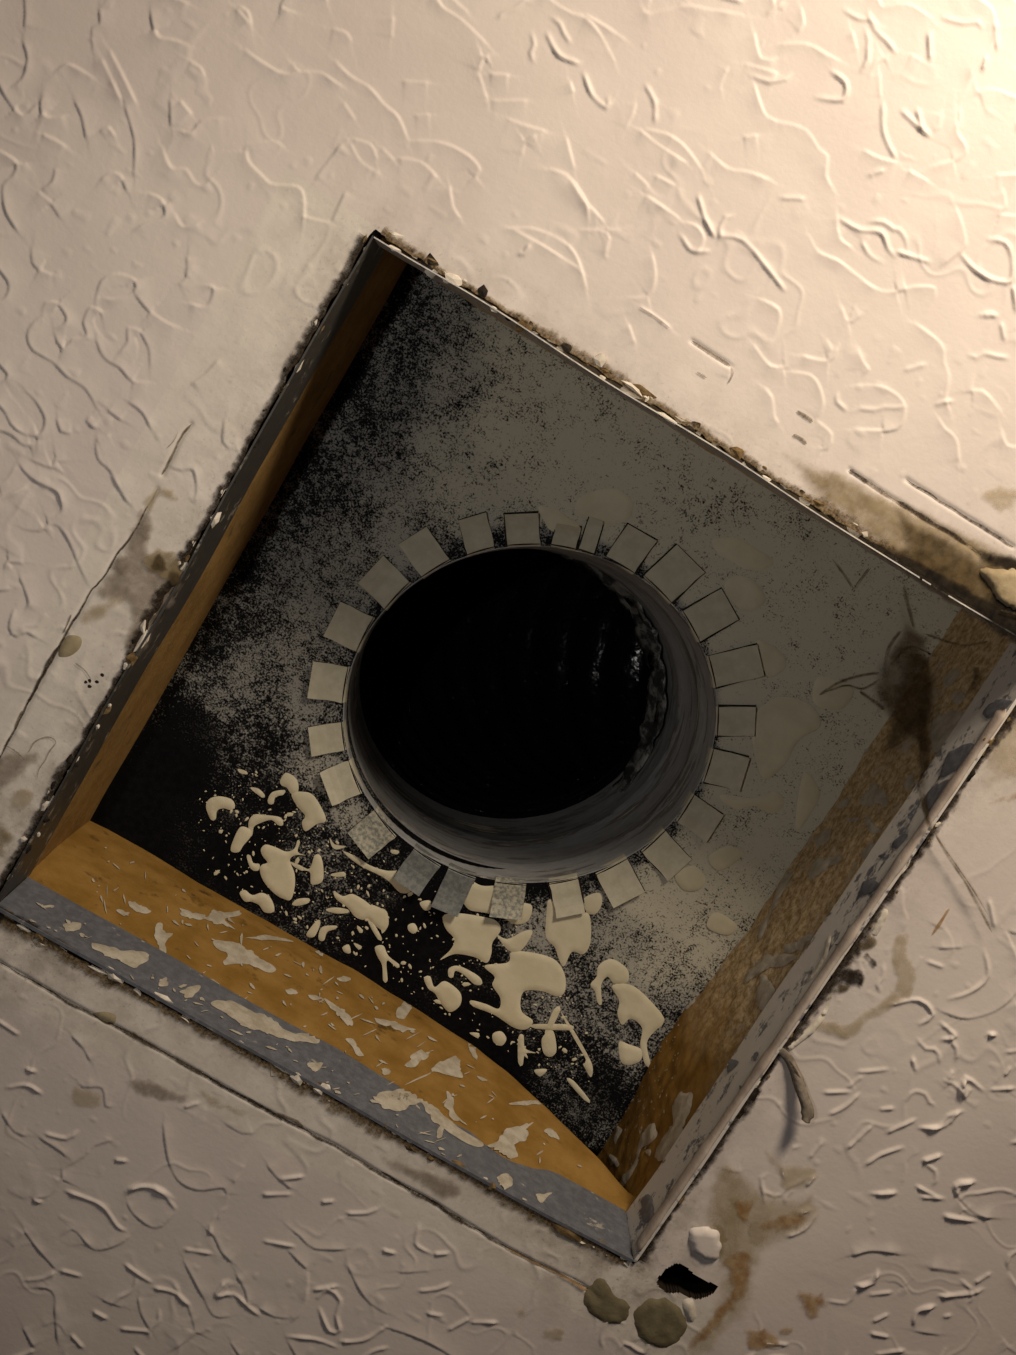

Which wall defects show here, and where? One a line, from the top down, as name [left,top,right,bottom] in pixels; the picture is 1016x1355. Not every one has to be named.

crack [0,425,191,775]
damp [85,491,181,652]
spalling [0,227,902,888]
damp [810,473,1016,643]
crack [0,962,589,1290]
spalling [0,707,1016,1267]
peeling [682,1298,696,1324]